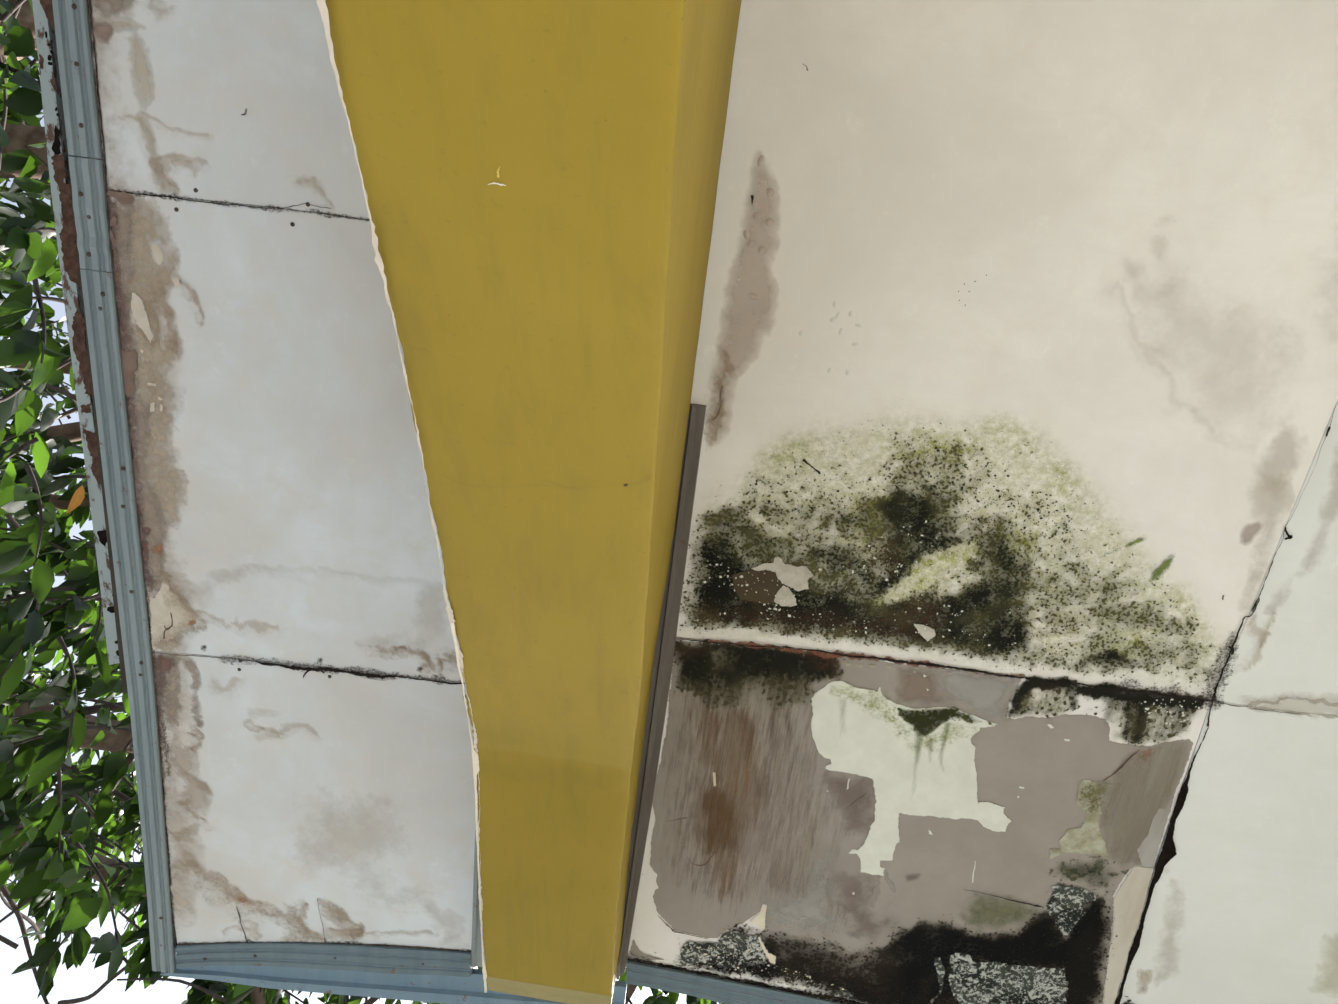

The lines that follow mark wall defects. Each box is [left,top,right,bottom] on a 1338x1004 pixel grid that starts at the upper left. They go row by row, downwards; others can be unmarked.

corrosion [94,0,131,42]
corrosion [39,0,81,288]
corrosion [72,307,101,485]
leakage [105,164,372,599]
corrosion [97,530,107,546]
leakage [152,638,467,842]
peeling [649,641,1193,1004]
leakage [671,422,1224,1004]
crack [1115,406,1336,1004]
peeling [1247,697,1338,718]
peeling [629,939,664,960]